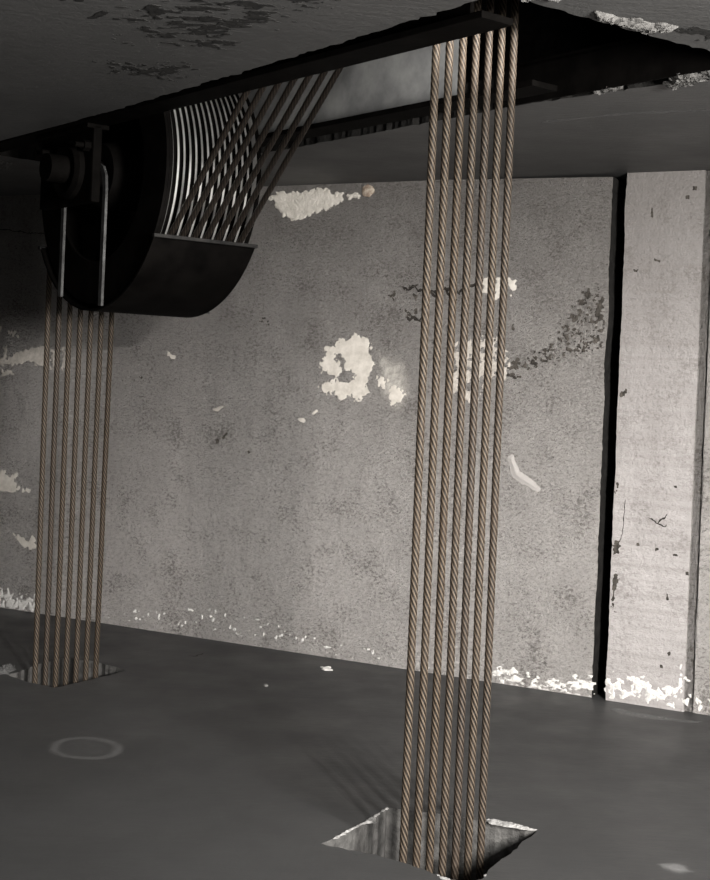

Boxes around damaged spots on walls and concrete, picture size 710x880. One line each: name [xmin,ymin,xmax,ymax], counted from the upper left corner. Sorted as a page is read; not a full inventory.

peeling [269,187,361,221]
peeling [482,277,517,300]
peeling [0,326,66,377]
peeling [318,332,406,406]
spalling [453,284,606,403]
peeling [0,469,31,493]